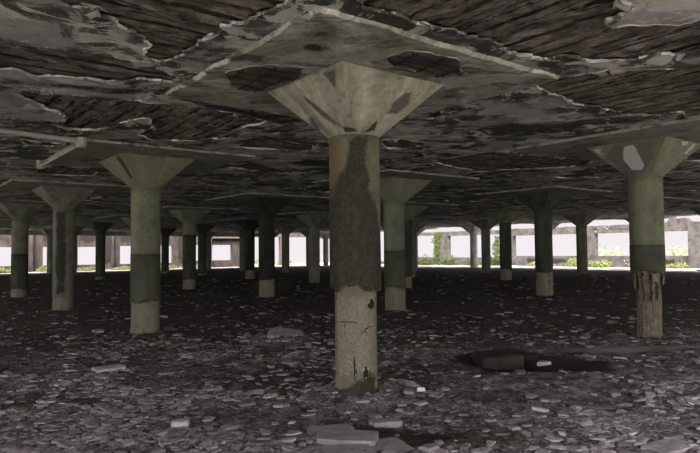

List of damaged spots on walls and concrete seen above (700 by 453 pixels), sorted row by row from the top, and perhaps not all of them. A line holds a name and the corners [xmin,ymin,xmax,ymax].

spalling [0,0,293,85]
spalling [357,0,700,120]
spalling [225,64,305,92]
spalling [15,90,320,153]
spalling [20,165,100,176]
spalling [379,139,428,151]
spalling [431,150,598,178]
peeling [623,144,645,170]
peeling [336,294,375,380]